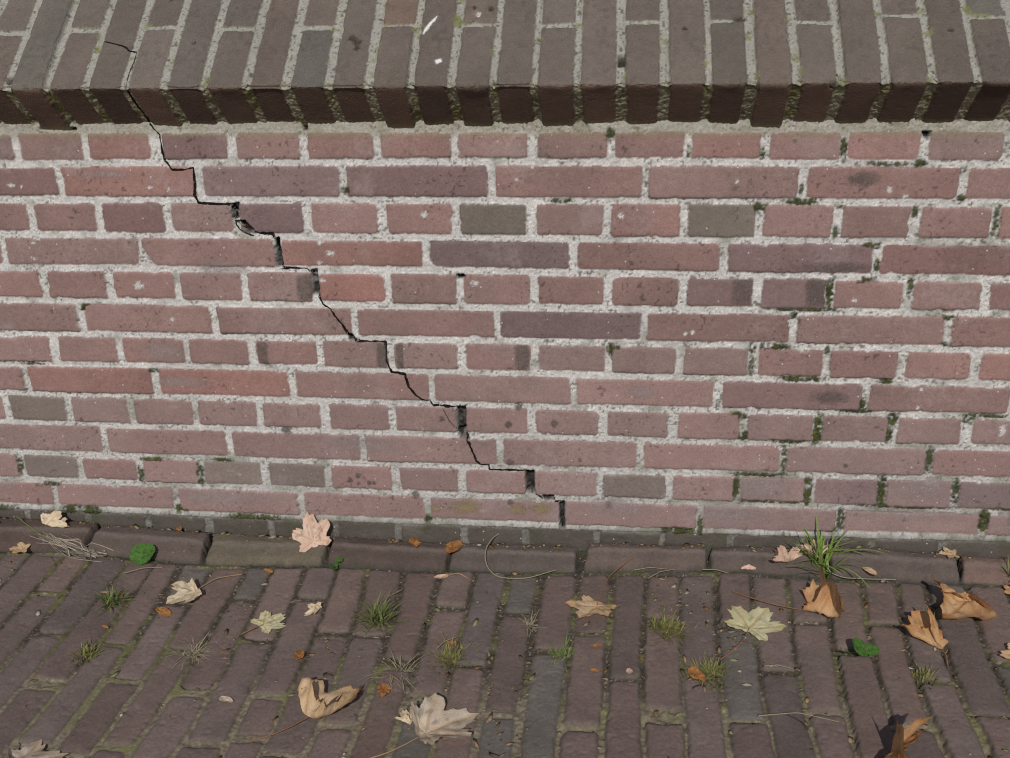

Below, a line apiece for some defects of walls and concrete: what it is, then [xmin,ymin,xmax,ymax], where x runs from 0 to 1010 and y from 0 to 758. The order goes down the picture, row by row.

crack [104,41,565,526]